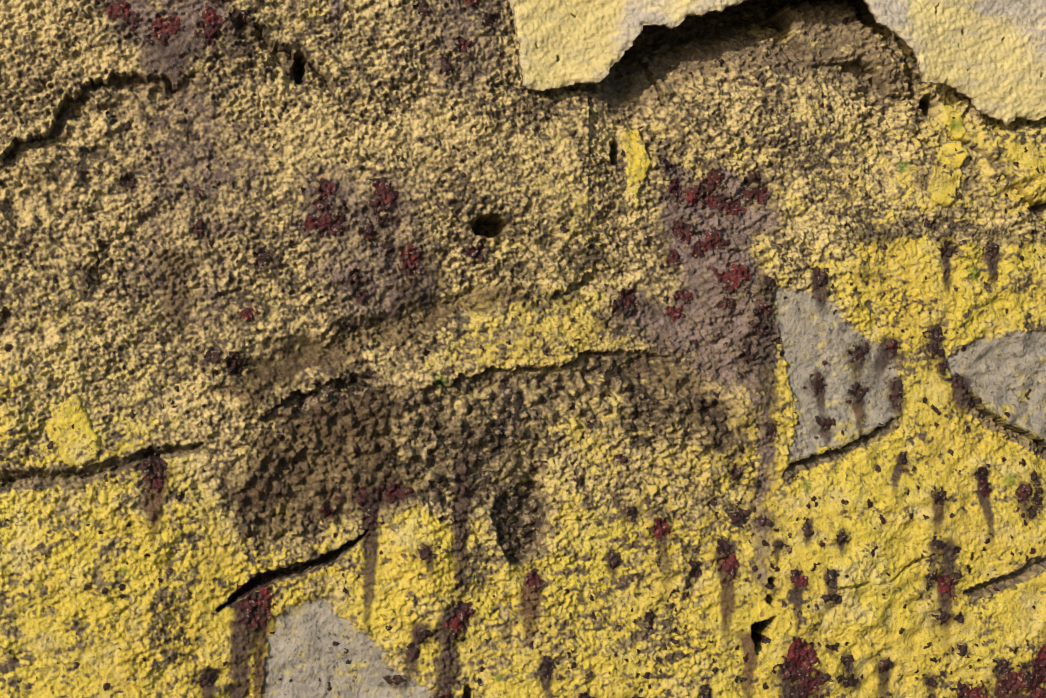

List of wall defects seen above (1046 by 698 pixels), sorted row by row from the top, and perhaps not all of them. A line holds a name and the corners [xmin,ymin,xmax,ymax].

spalling [226,5,338,118]
flaking render [507,0,1046,208]
crack [0,440,205,493]
damp [237,397,398,509]
peeling [772,286,903,484]
peeling [947,329,1046,466]
crack [215,530,366,613]
crack [836,552,939,593]
crack [963,554,1046,597]
peeling [260,597,436,698]